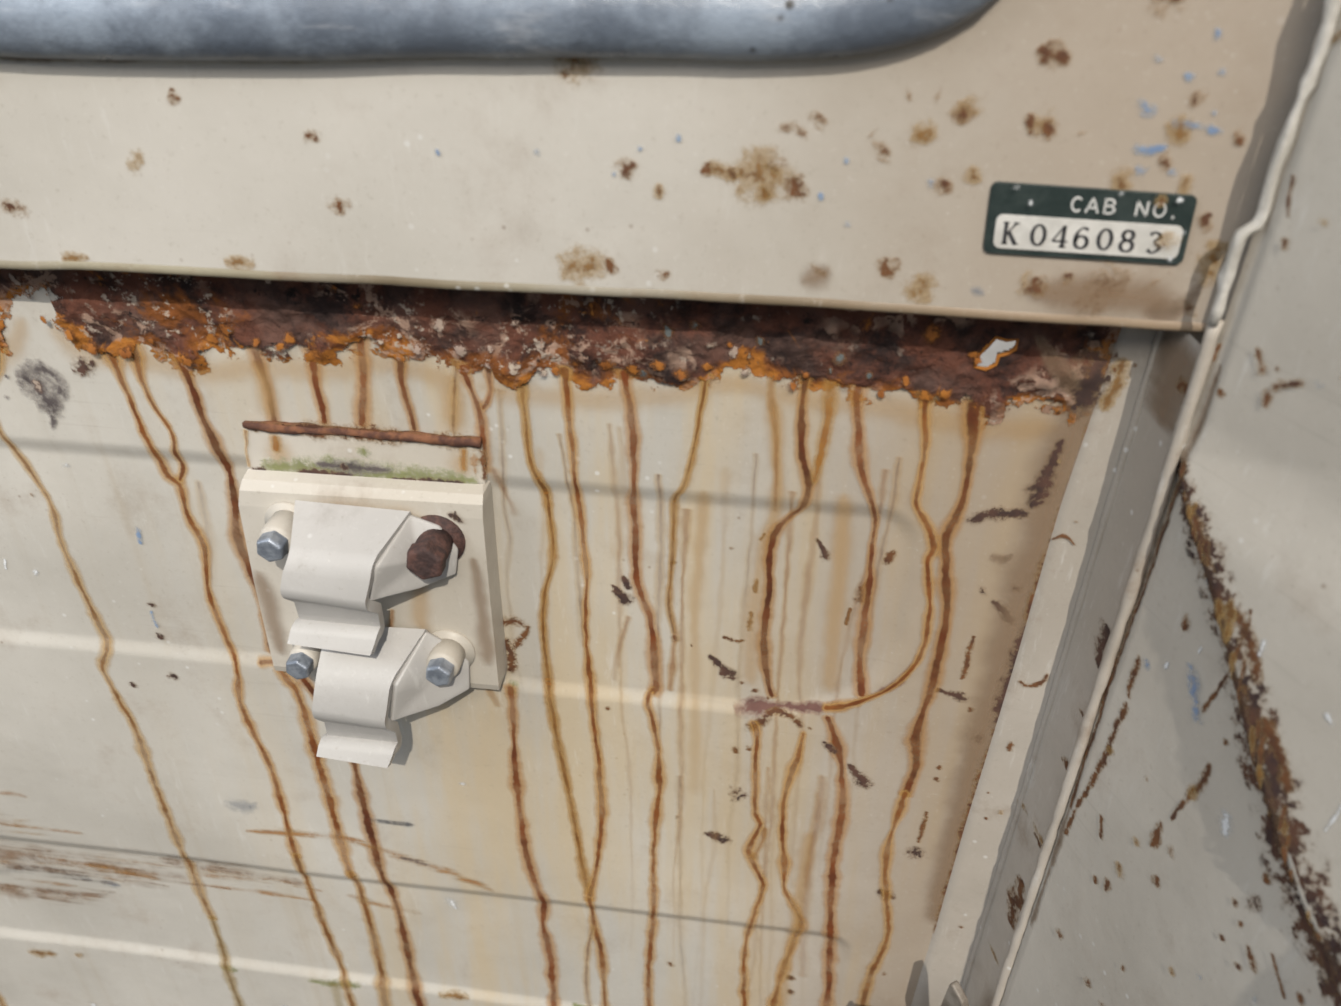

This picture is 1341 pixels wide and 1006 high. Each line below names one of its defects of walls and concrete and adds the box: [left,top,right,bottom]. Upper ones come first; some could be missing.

corrosion [1037,40,1071,65]
corrosion [912,125,936,143]
corrosion [953,101,976,124]
corrosion [1026,113,1055,140]
corrosion [1167,118,1189,141]
corrosion [700,149,806,201]
corrosion [1158,176,1191,207]
corrosion [1286,175,1294,217]
corrosion [0,213,1227,1006]
corrosion [1007,343,1341,1006]